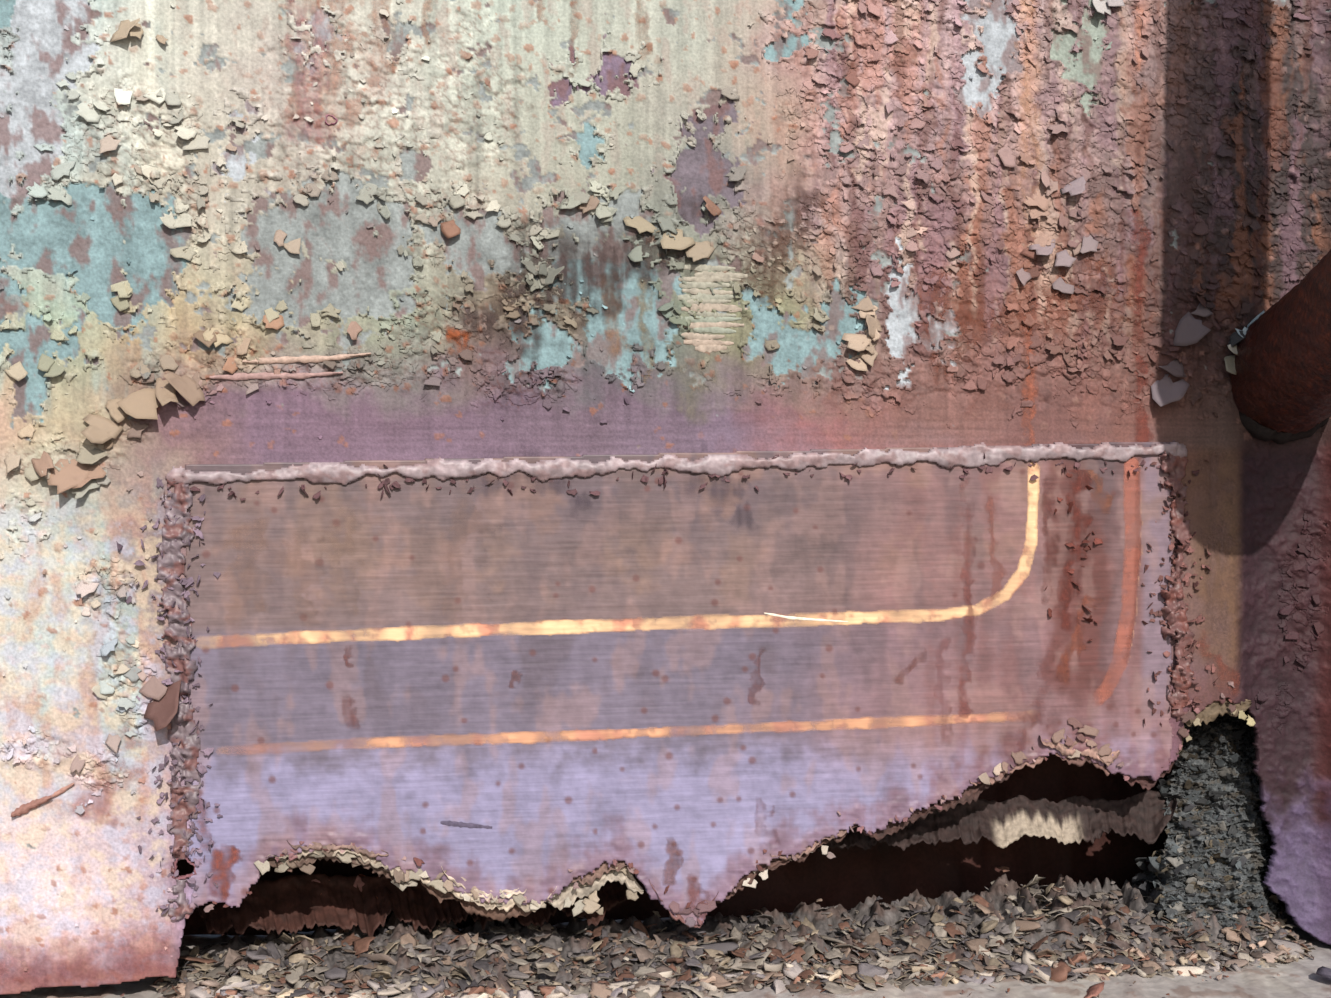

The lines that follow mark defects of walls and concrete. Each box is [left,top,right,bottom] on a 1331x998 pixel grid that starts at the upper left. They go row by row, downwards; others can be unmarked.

peeling [0,0,1331,559]
peeling [69,555,138,623]
peeling [0,634,181,815]
peeling [1178,712,1201,742]
peeling [1051,725,1113,766]
peeling [978,751,1028,785]
peeling [810,840,836,859]
peeling [254,845,481,902]
peeling [527,882,603,917]
peeling [613,866,639,901]
peeling [669,899,717,927]
peeling [743,869,768,888]